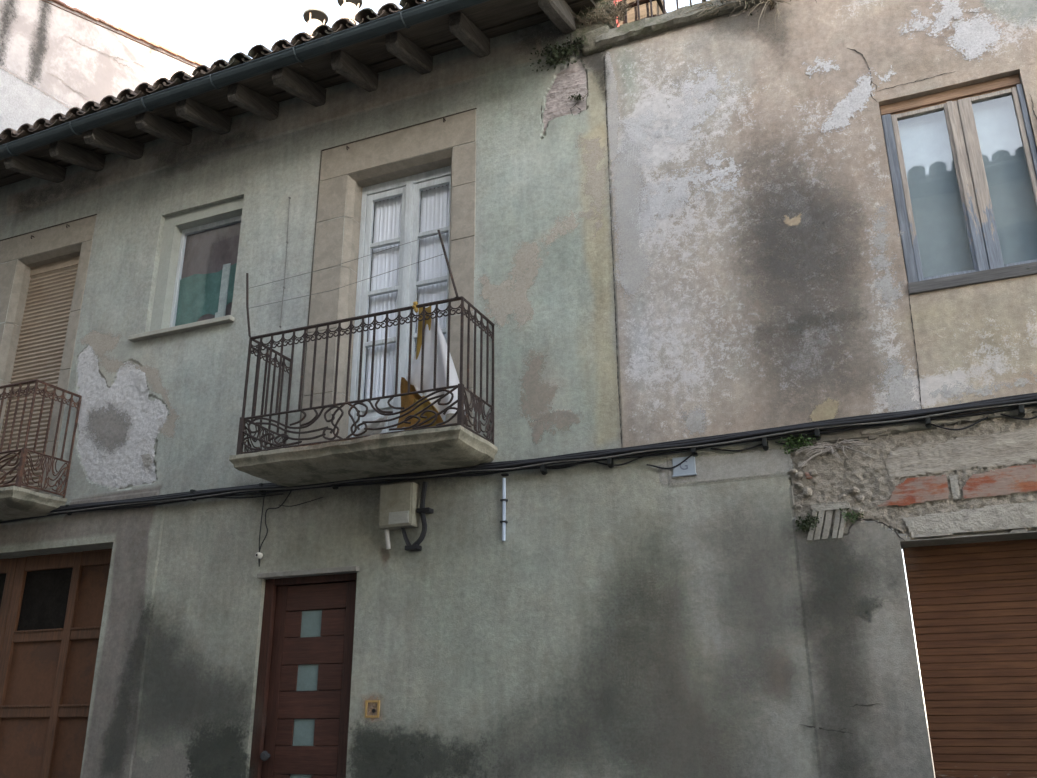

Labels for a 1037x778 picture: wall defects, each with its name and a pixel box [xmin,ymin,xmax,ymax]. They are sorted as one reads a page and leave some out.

leakage [0,0,16,62]
leakage [29,0,51,83]
spalling [543,59,588,134]
peeling [818,64,897,134]
crack [848,48,956,102]
peeling [897,0,1006,62]
leakage [757,169,849,391]
spalling [77,330,180,489]
peeling [809,398,840,421]
spalling [659,413,1037,541]
leakage [102,610,255,778]
leakage [345,631,635,778]